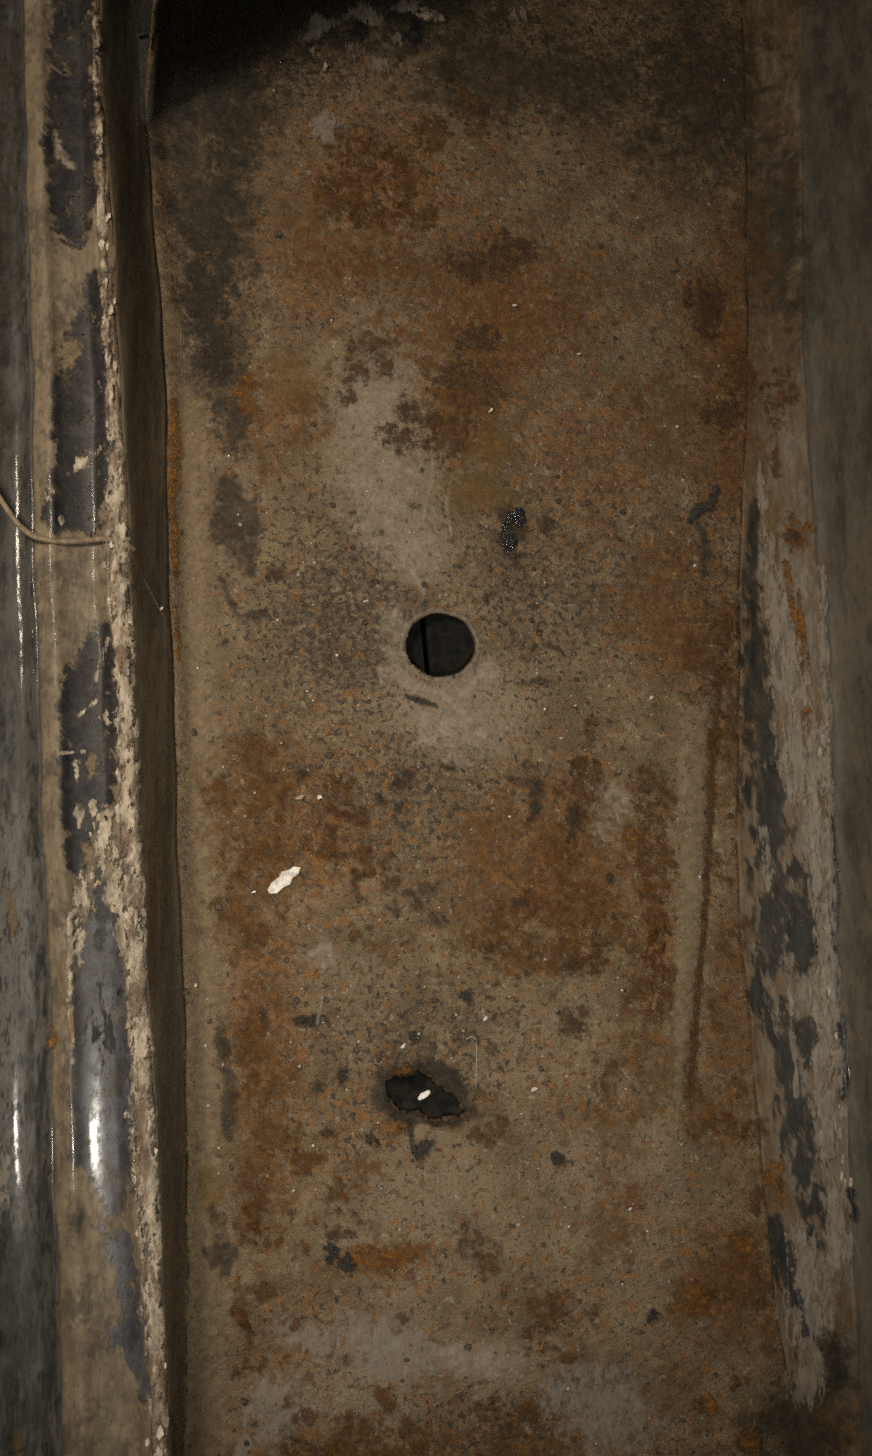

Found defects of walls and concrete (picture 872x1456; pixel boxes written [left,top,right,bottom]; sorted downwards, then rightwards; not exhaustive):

rust [336,333,393,406]
rust [372,322,504,463]
peeling [38,0,169,1456]
rust [229,1282,280,1376]
rust [233,1007,325,1248]
rust [200,731,401,952]
rust [280,1387,430,1456]
rust [294,1177,424,1275]
rust [462,713,678,1022]
rust [556,1000,589,1037]
rust [682,595,790,1214]
peeling [734,461,859,1407]